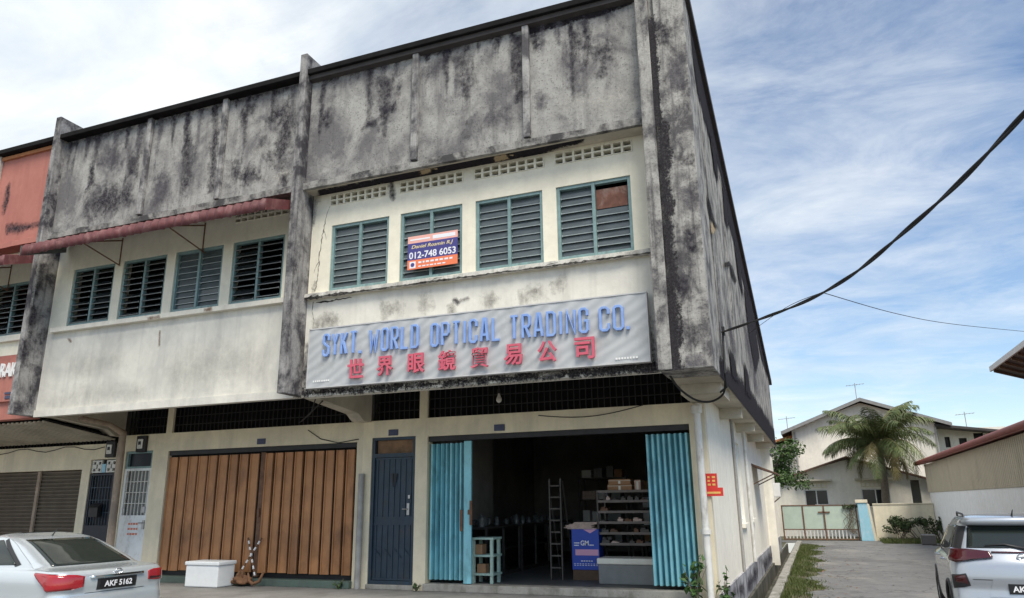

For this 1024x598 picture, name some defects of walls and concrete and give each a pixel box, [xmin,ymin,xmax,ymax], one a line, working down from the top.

damp [67,106,218,212]
damp [232,85,295,187]
mould [19,266,44,371]
crack [304,207,651,325]
damp [298,3,776,446]